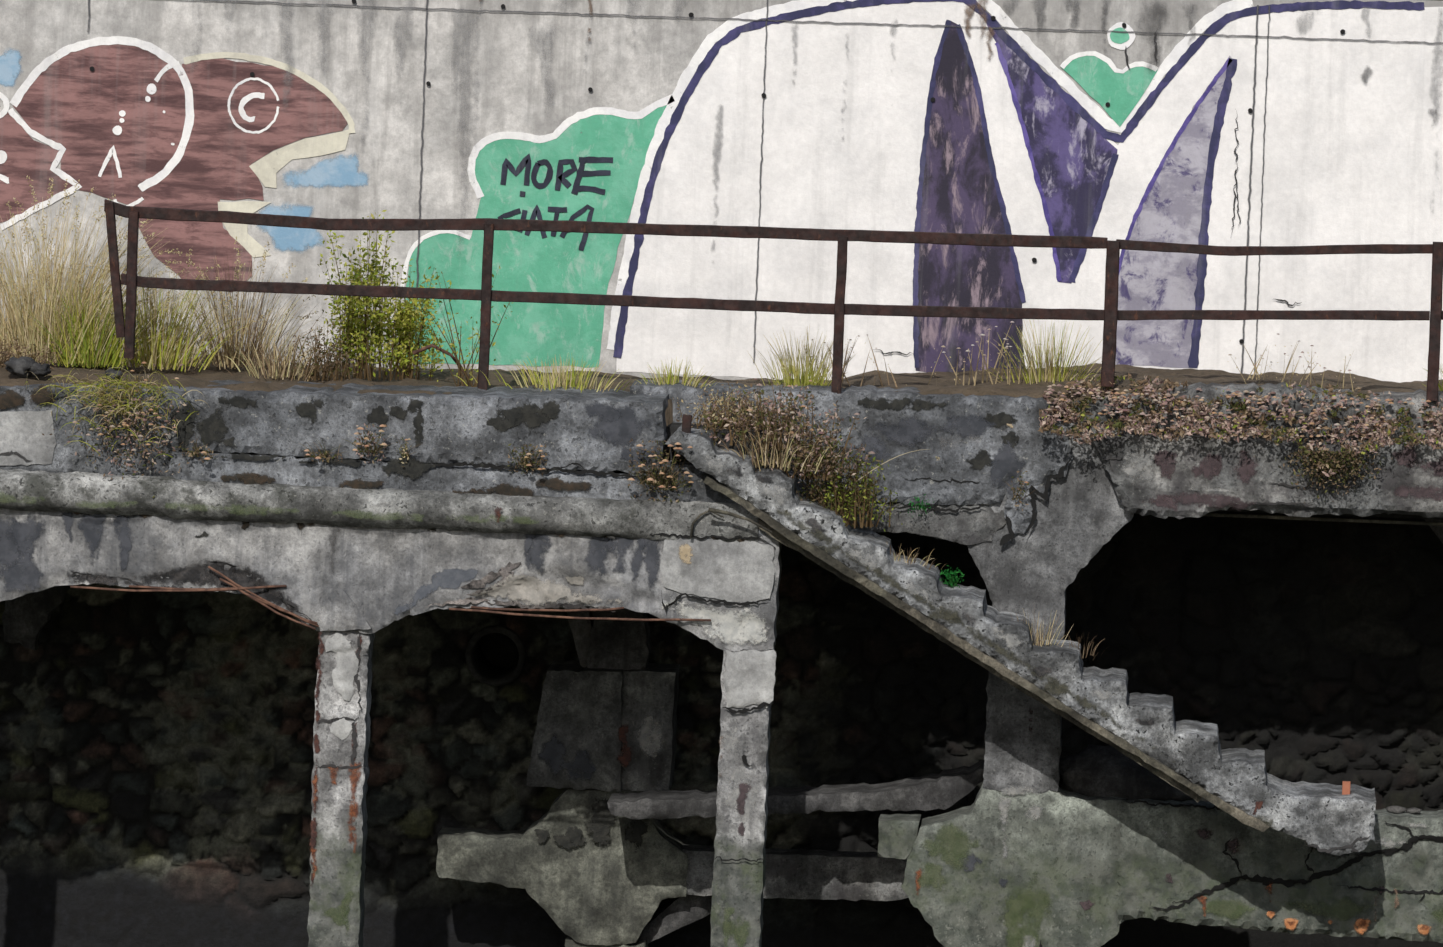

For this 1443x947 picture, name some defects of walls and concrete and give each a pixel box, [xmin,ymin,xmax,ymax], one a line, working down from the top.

crack [889,457,1132,546]
damp [0,493,45,591]
damp [62,501,135,571]
spalling [56,561,297,611]
damp [464,515,551,572]
damp [585,536,660,588]
crack [650,532,761,540]
crack [661,593,771,612]
corrosion [309,631,361,886]
crack [1125,800,1443,911]
corrosion [1265,883,1298,929]
corrosion [1354,886,1399,934]